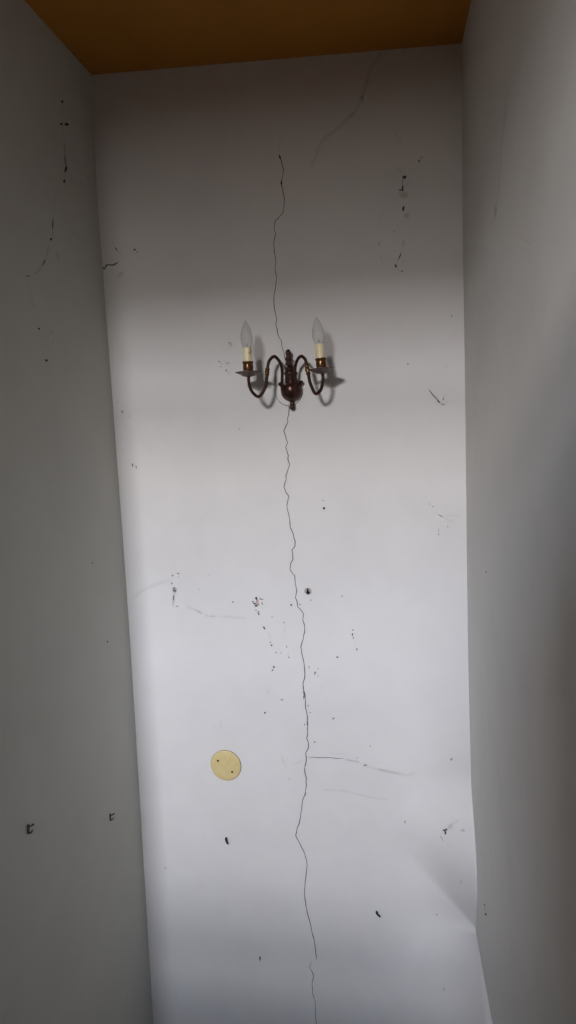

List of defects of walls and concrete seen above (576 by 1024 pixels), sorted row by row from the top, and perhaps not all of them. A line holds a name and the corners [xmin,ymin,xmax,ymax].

crack [273,155,286,370]
crack [263,408,367,1024]